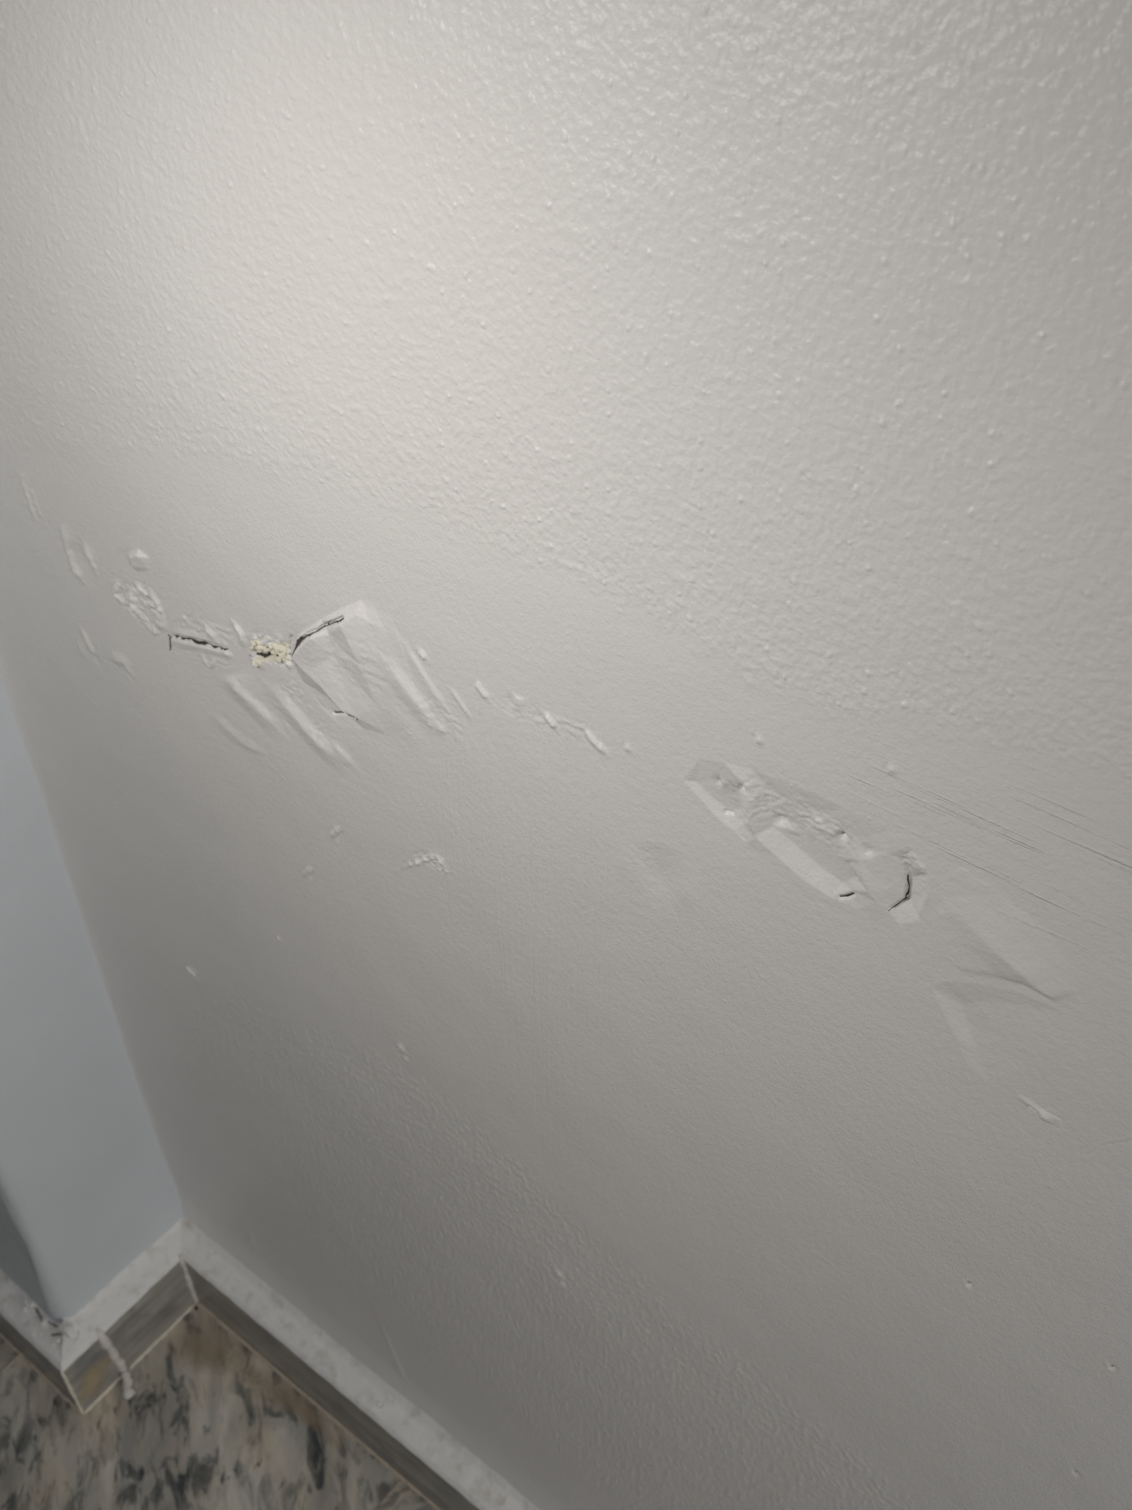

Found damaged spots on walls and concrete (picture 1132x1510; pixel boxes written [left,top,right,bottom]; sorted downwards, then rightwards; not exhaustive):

crack [168,617,344,658]
peeling [106,546,477,760]
spalling [664,754,936,932]